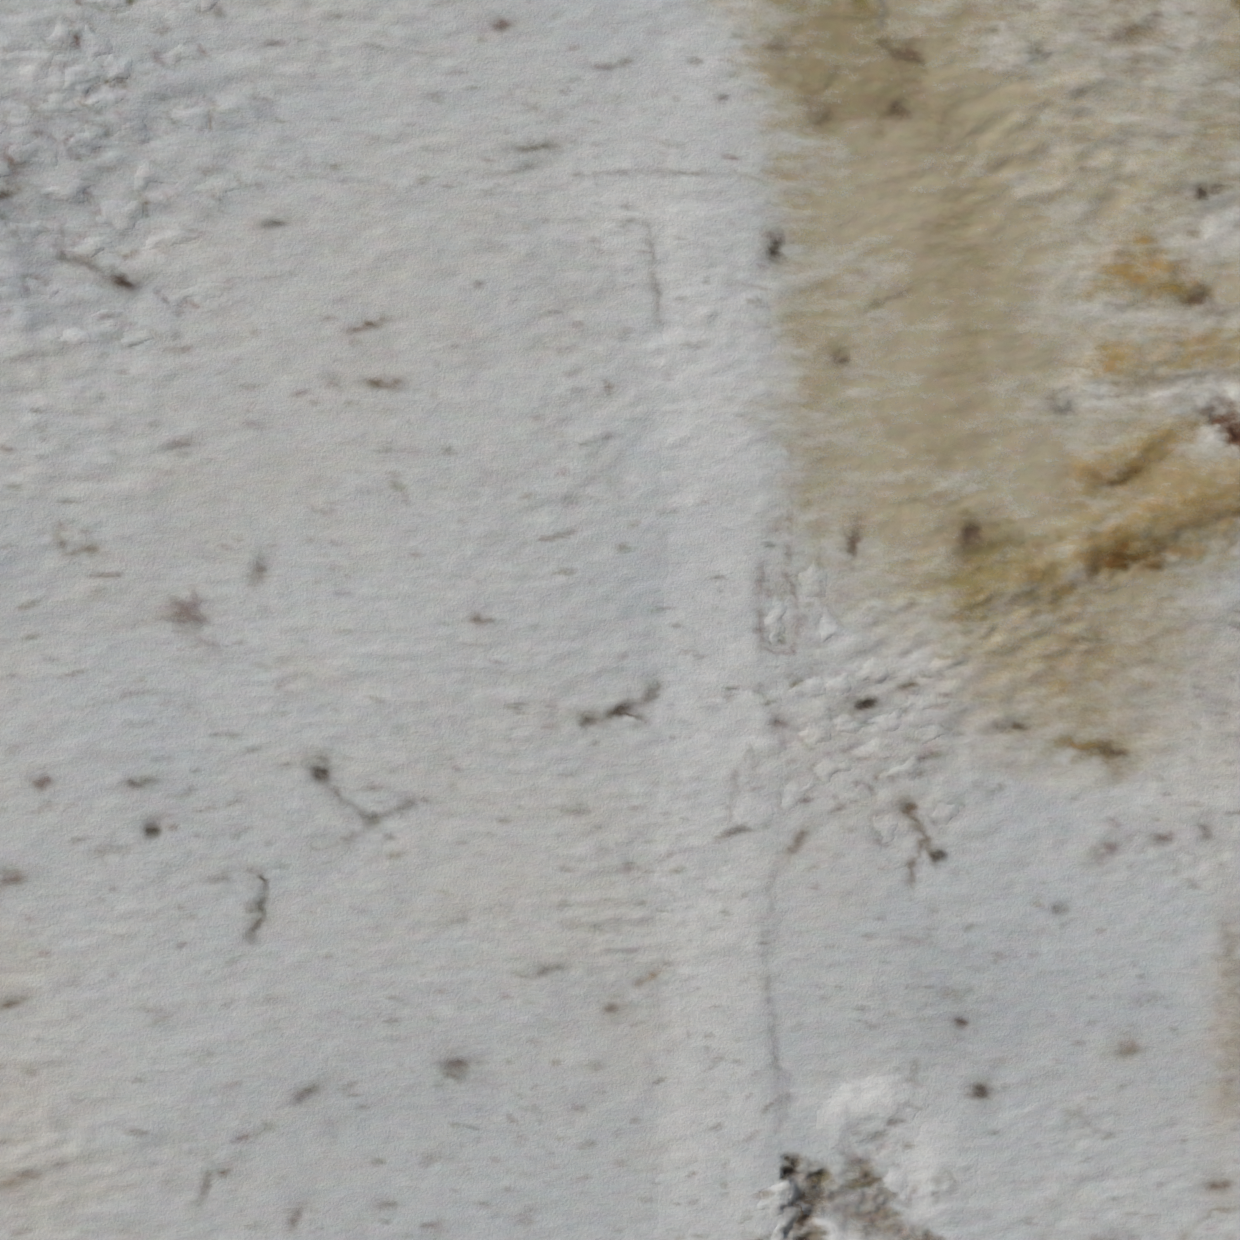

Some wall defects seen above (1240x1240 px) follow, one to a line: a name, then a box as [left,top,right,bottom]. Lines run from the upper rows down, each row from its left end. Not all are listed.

damp [1111,429,1184,484]
damp [953,525,1047,619]
damp [1062,738,1108,750]
spalling [757,1156,931,1240]